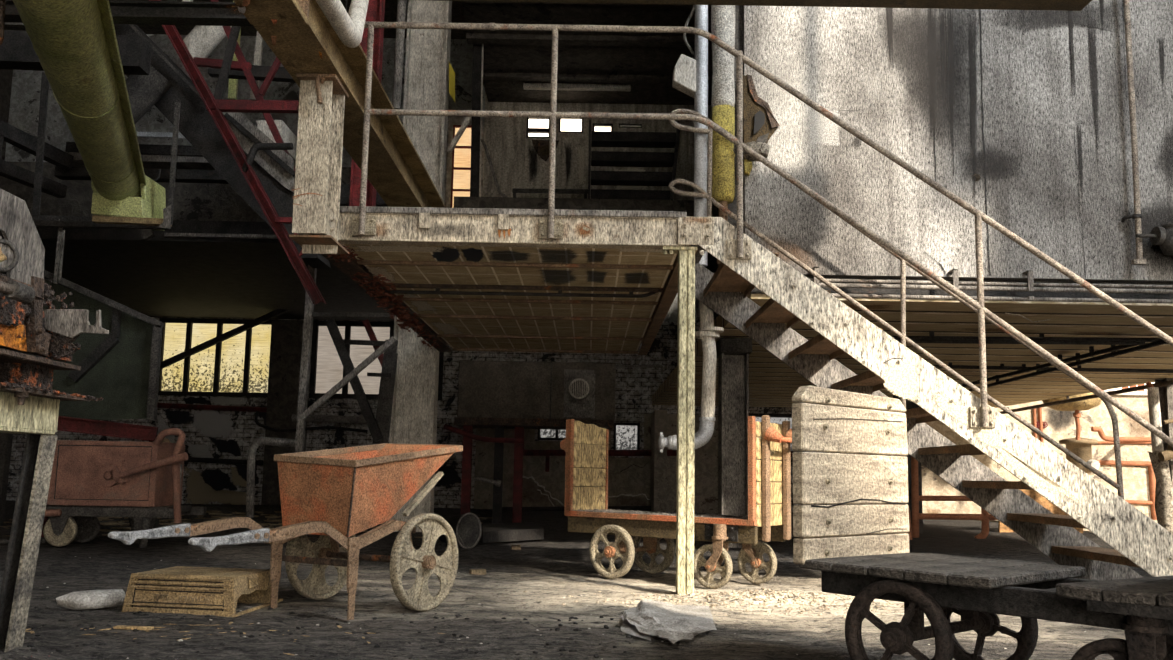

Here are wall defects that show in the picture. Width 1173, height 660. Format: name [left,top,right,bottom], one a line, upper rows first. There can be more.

leakage [968,15,977,197]
leakage [1088,0,1104,150]
peeling [156,396,259,491]